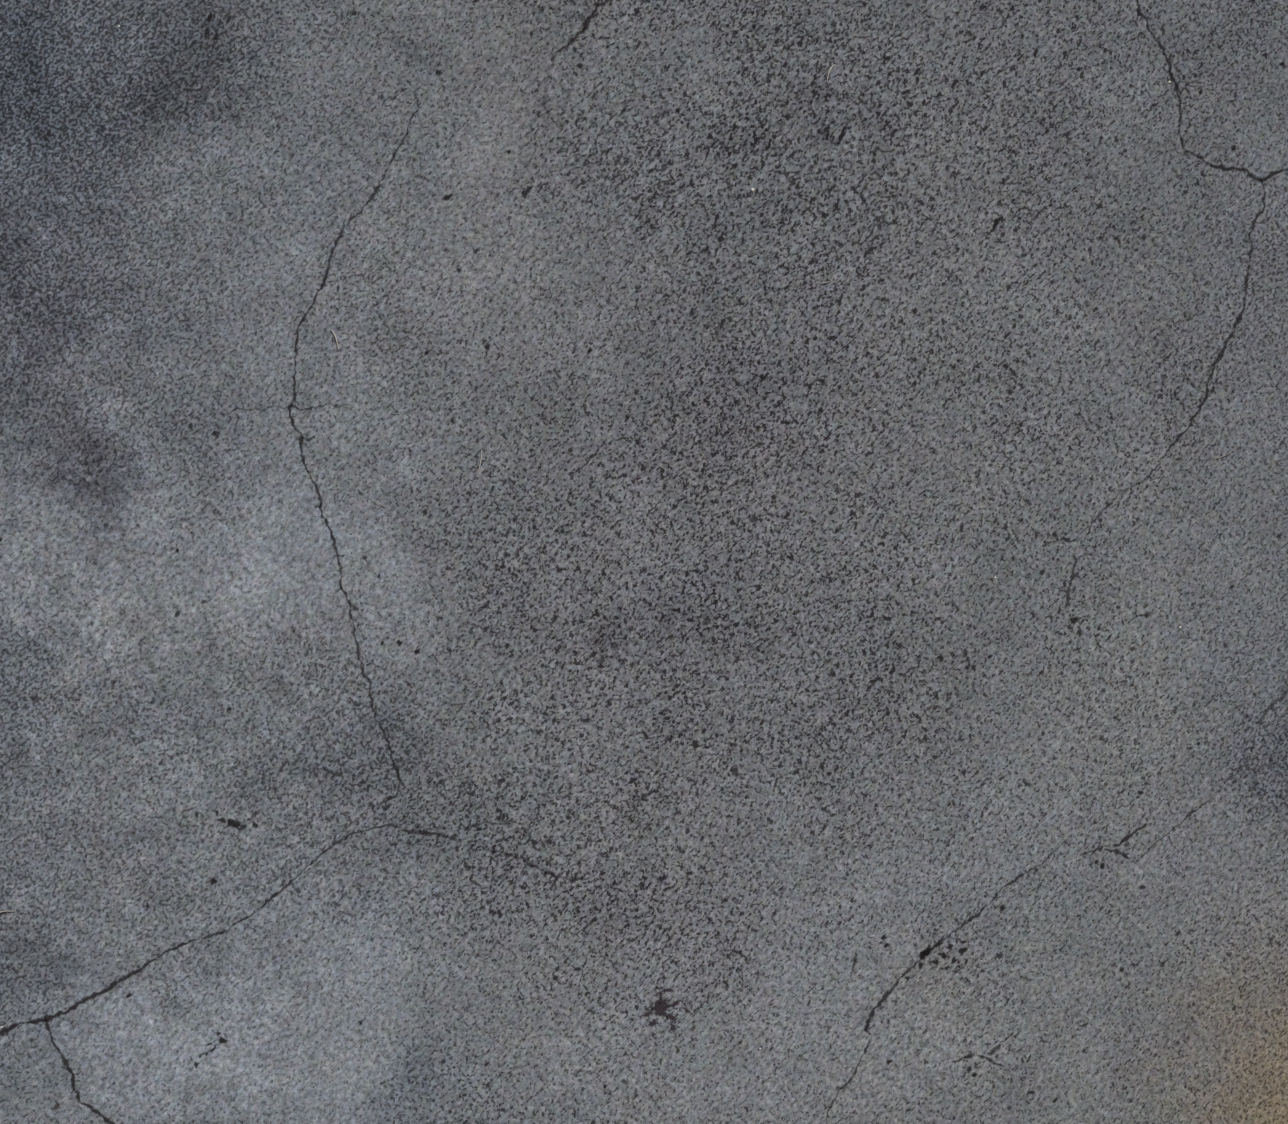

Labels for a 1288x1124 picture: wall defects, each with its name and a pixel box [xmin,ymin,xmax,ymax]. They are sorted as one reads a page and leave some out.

crack [557,0,609,52]
crack [1137,0,1288,479]
crack [0,103,454,1124]
crack [1066,561,1077,607]
crack [497,823,599,881]
crack [826,770,1240,1123]